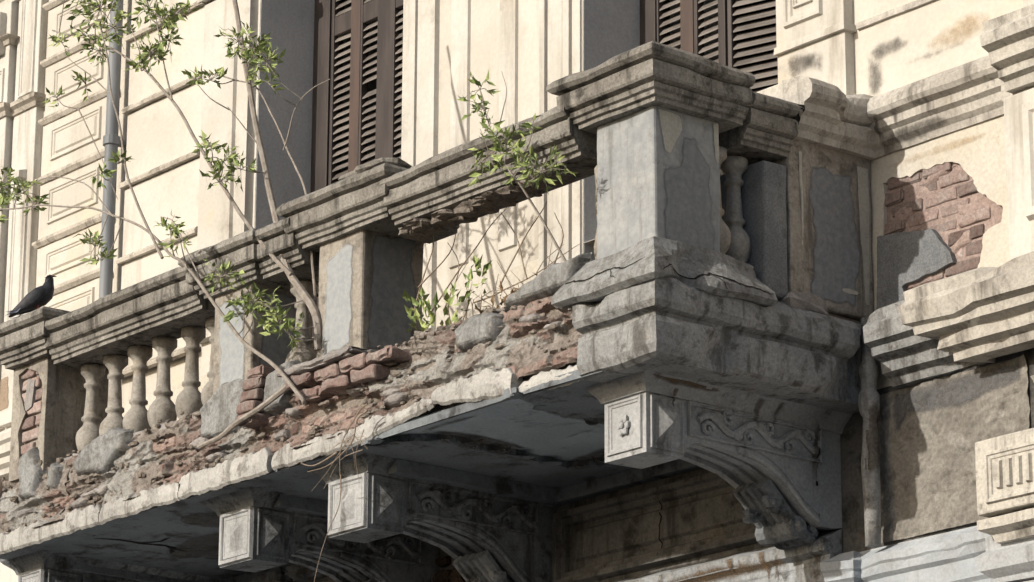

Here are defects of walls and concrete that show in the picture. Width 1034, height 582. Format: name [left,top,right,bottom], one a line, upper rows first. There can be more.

spalling [398,170,576,241]
spalling [876,162,1003,310]
crack [565,258,775,294]
spalling [0,296,615,534]
spalling [432,556,466,582]